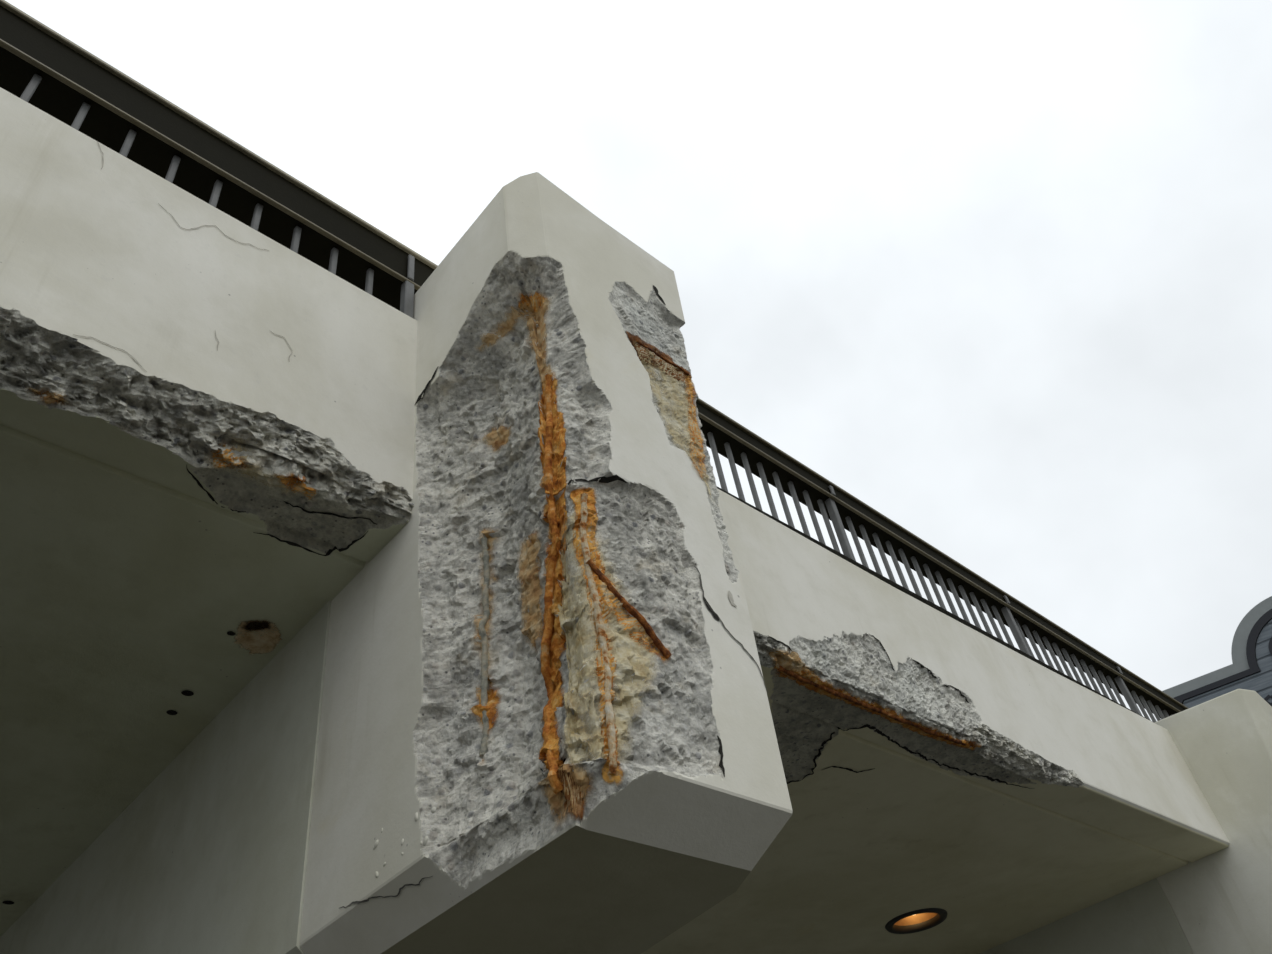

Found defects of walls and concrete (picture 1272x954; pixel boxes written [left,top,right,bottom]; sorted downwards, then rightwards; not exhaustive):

corrosion [213,445,316,499]
crack [186,465,377,556]
spalling [0,251,739,889]
corrosion [471,577,499,728]
corrosion [480,292,667,820]
corrosion [626,331,710,493]
crack [694,564,801,693]
corrosion [769,650,980,750]
crack [786,724,1035,789]
peeling [753,630,1085,788]
crack [340,876,432,908]